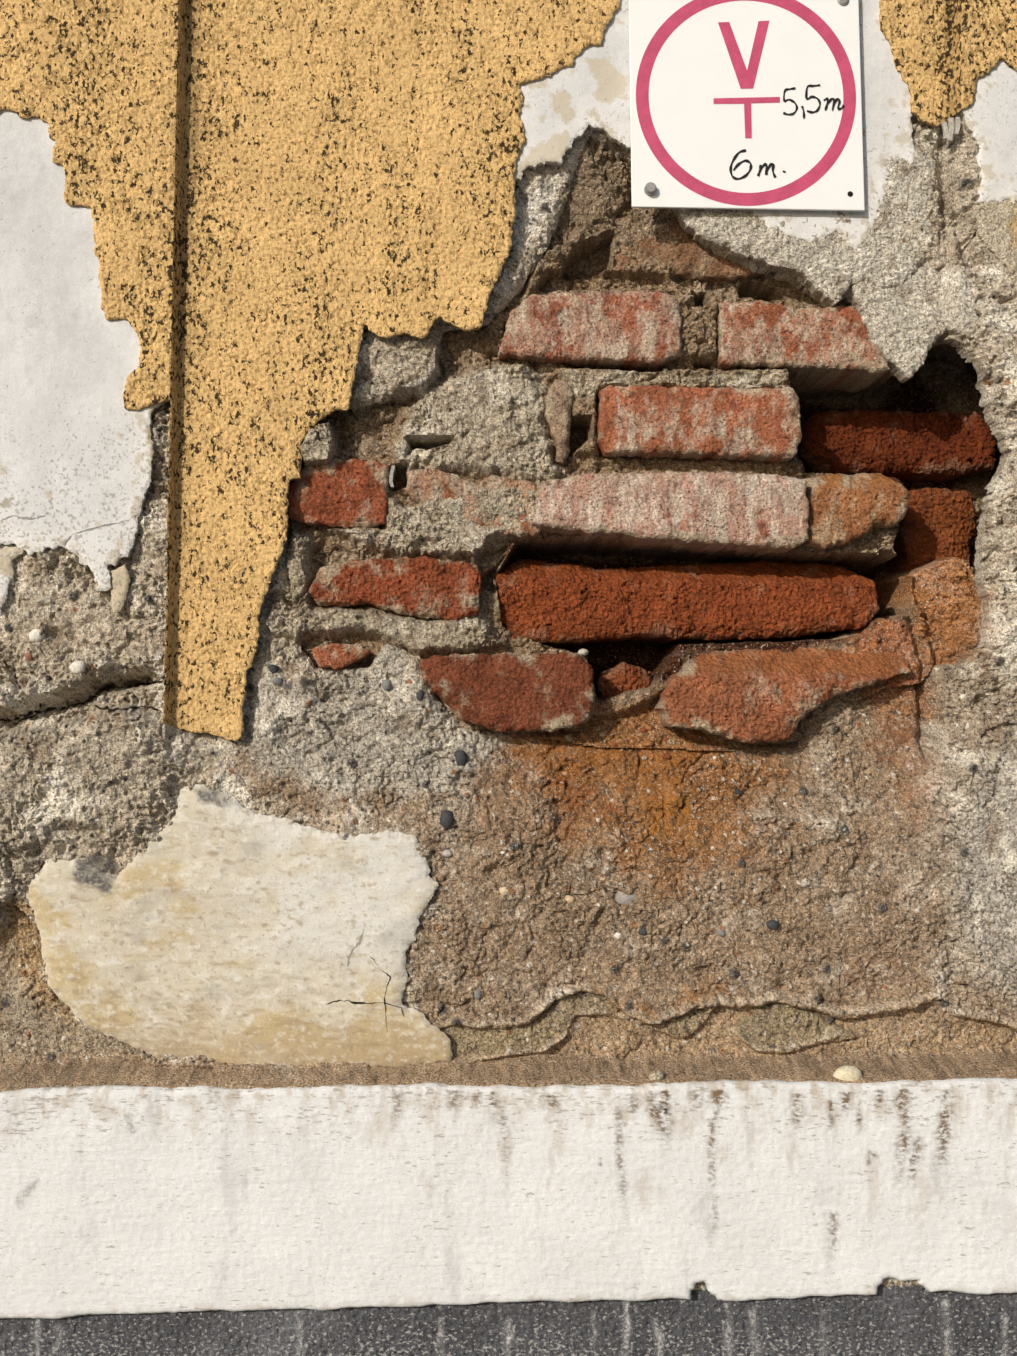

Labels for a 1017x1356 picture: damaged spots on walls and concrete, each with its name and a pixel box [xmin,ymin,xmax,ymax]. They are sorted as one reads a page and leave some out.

spalling [0,0,1017,1067]
crack [0,662,164,725]
water stain [898,1089,920,1171]
water stain [939,1091,952,1154]